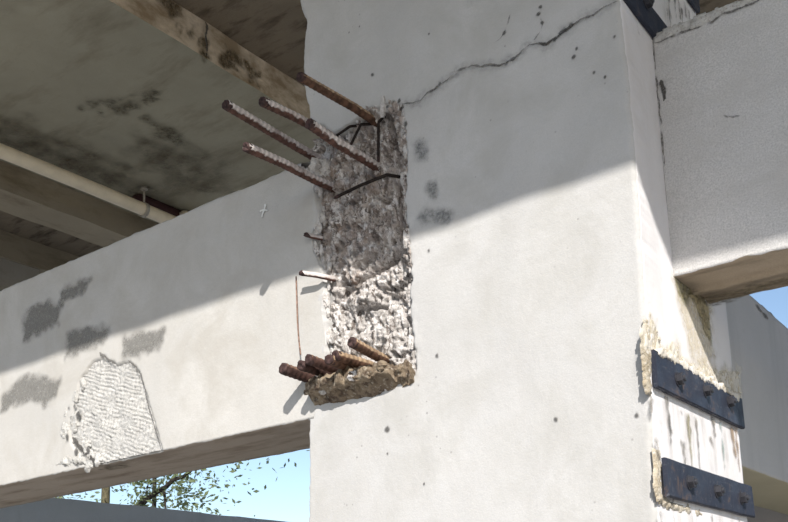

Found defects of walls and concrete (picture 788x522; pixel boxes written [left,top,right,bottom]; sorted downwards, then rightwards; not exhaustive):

damp [180,31,261,82]
crack [386,2,614,112]
spalling [222,72,417,406]
spalling [676,279,712,362]
spalling [56,352,163,473]